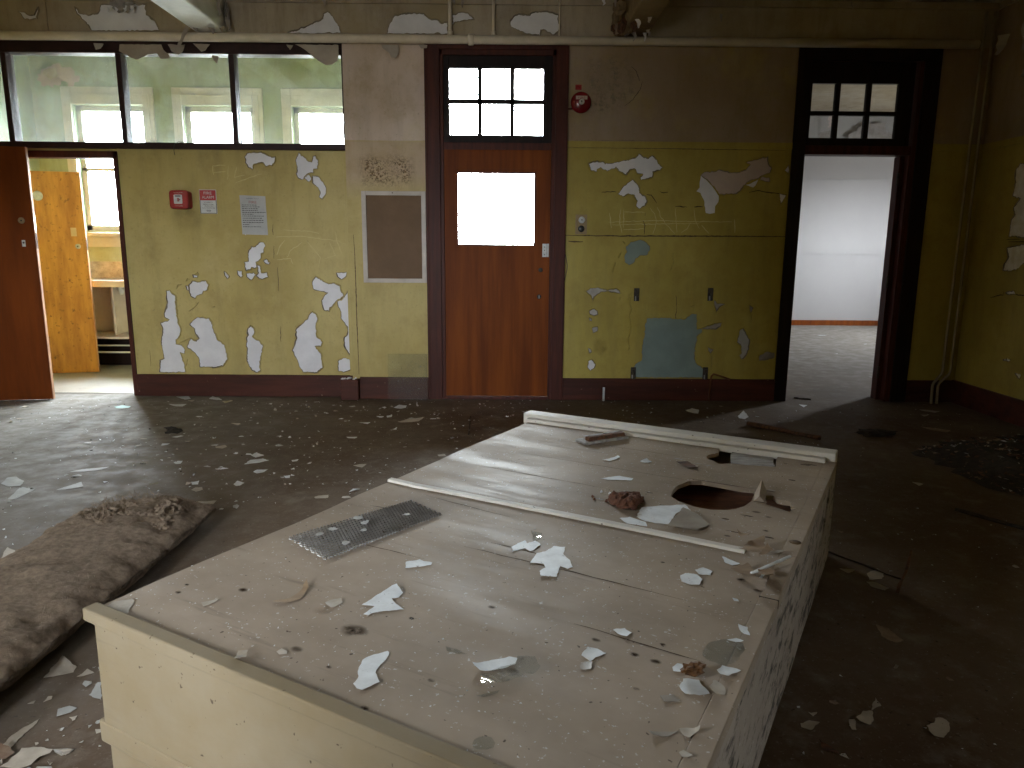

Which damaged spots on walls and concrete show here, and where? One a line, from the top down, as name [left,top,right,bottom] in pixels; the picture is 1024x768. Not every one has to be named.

peeling [74,0,231,64]
peeling [381,0,475,58]
peeling [508,10,562,36]
peeling [244,151,276,171]
peeling [295,152,327,200]
peeling [587,153,664,210]
peeling [697,156,790,214]
peeling [224,241,271,281]
peeling [159,274,229,374]
peeling [245,325,264,373]
peeling [291,272,350,374]
peeling [633,300,725,378]